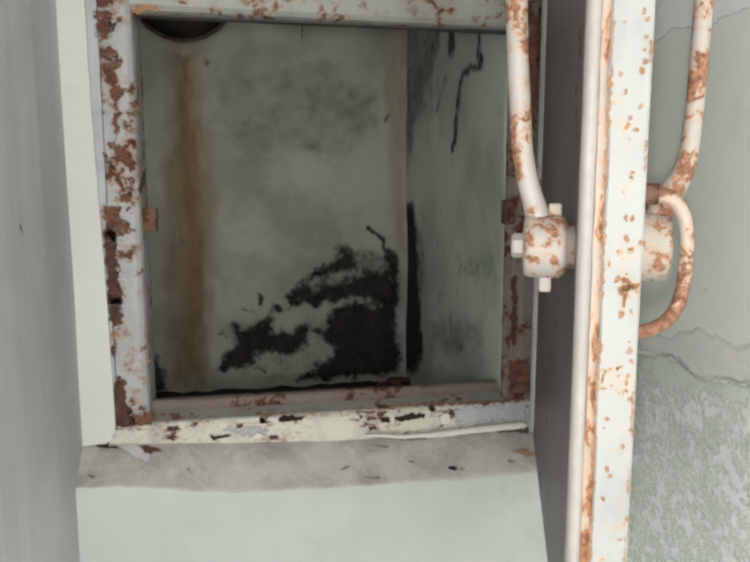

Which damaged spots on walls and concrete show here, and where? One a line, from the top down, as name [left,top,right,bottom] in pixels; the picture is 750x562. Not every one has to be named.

corrosion [131,4,159,14]
corrosion [528,15,541,130]
corrosion [93,0,141,357]
corrosion [167,55,210,380]
water stain [218,202,424,382]
corrosion [510,275,519,350]
corrosion [113,376,156,427]
corrosion [209,412,314,441]
corrosion [356,358,531,431]
peeling [365,414,526,447]
peeling [627,328,750,562]